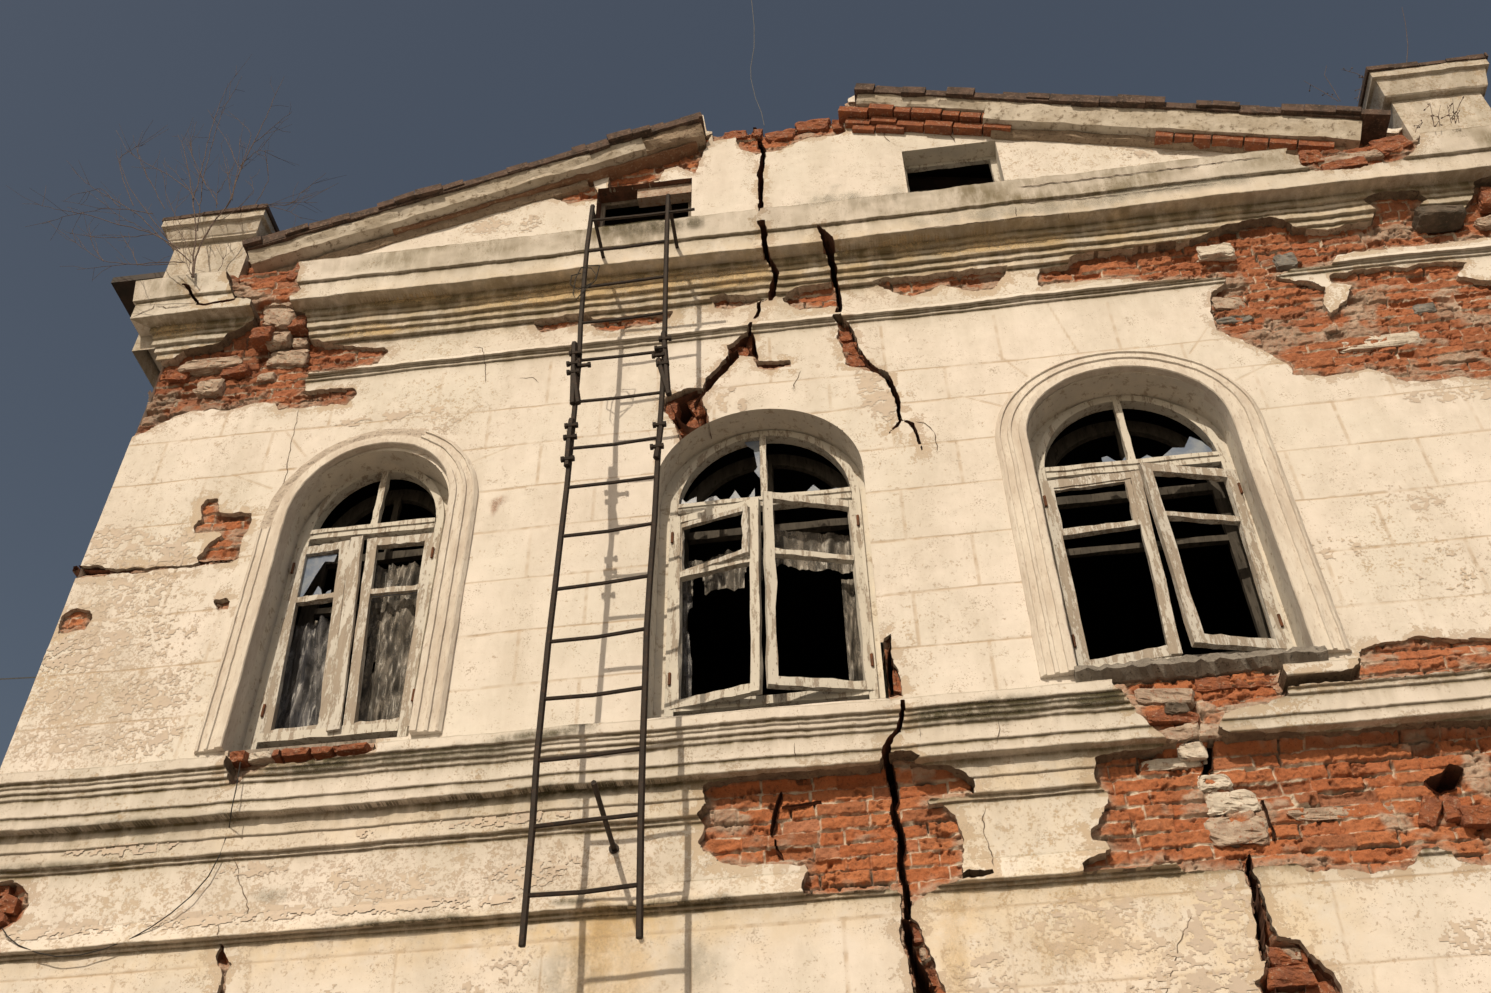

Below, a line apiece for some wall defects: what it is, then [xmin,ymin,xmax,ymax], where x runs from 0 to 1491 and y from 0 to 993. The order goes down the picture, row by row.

flaking render [561,102,1011,204]
spalling [135,261,460,435]
crack [669,127,779,434]
crack [817,225,938,450]
spalling [1037,176,1491,403]
peeling [9,498,252,762]
crack [216,855,249,993]
spalling [697,750,1002,921]
crack [881,638,946,993]
crack [1199,740,1215,782]
spalling [952,635,1491,993]
crack [1245,800,1306,993]